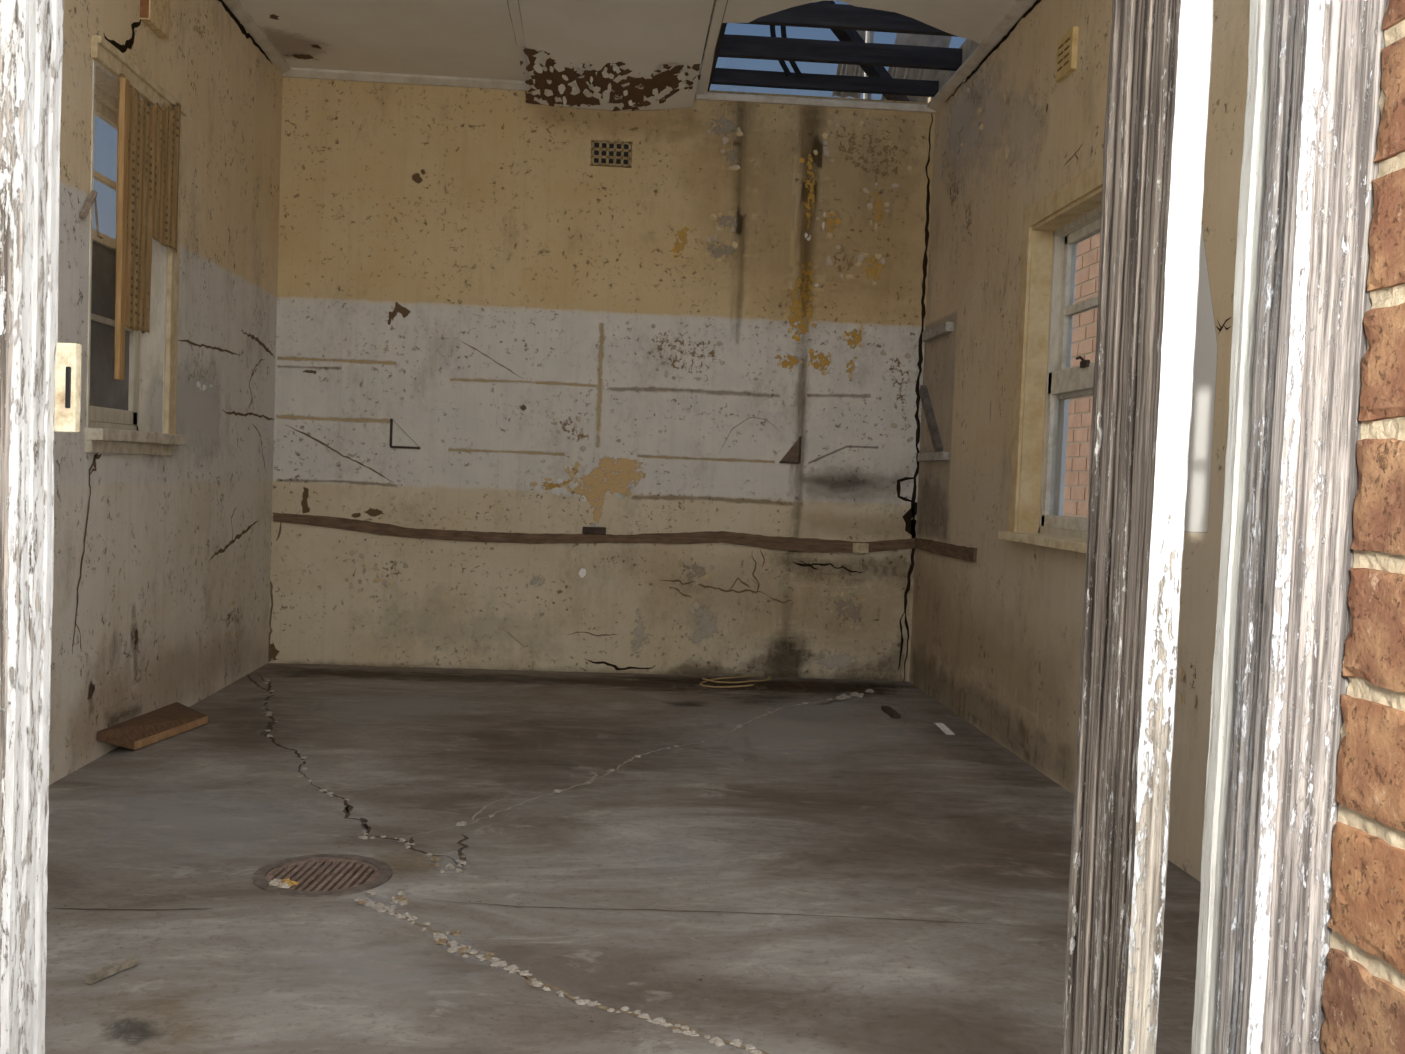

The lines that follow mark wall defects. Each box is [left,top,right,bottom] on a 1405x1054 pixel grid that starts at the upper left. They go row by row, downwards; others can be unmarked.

crack [104,19,141,53]
crack [218,0,272,64]
peeling [520,48,701,111]
peeling [777,121,915,380]
peeling [880,350,917,443]
peeling [531,414,646,527]
crack [247,0,1041,1054]